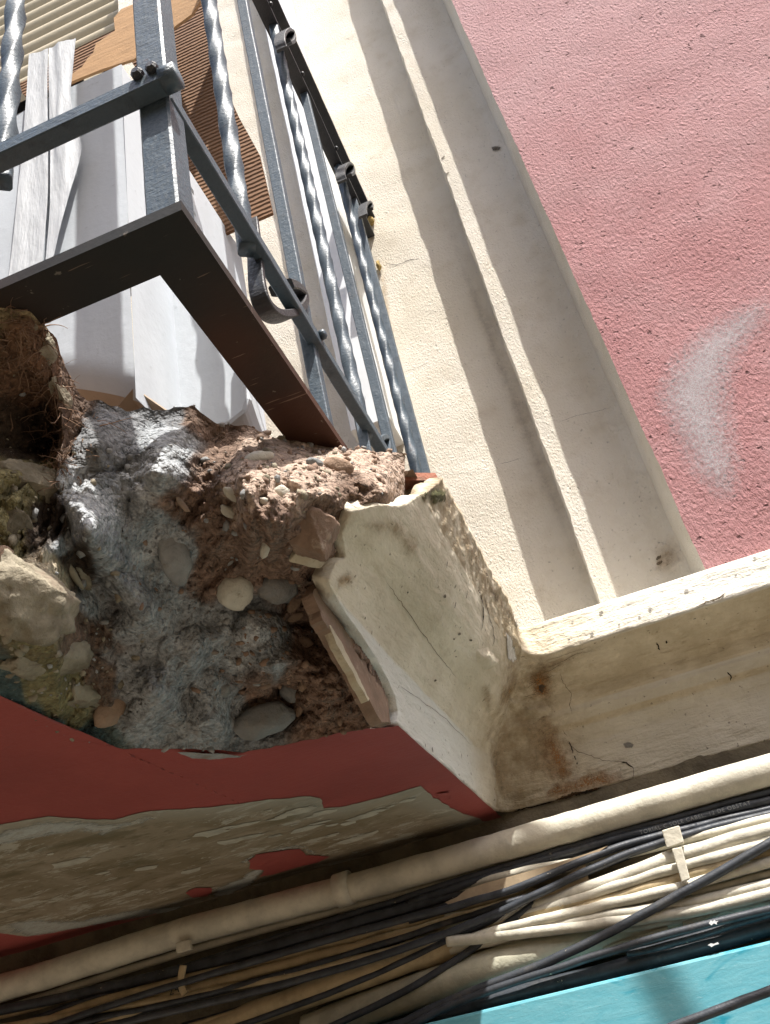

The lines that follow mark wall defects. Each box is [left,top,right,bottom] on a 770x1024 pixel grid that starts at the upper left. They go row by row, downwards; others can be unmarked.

spalling [0,305,408,760]
peeling [0,786,487,937]